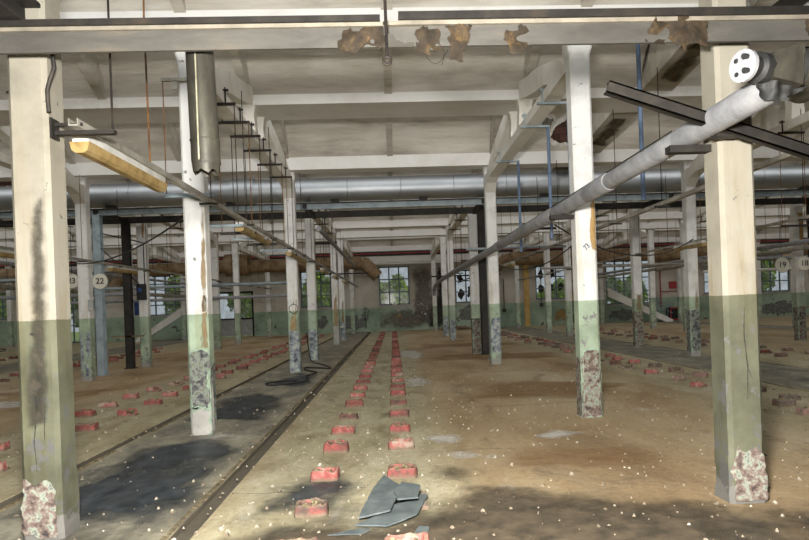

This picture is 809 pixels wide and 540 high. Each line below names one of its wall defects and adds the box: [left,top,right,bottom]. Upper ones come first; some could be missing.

spalling [540,114,568,147]
spalling [685,308,701,353]
spalling [188,349,216,435]
spalling [576,348,603,418]
spalling [730,447,769,502]
spalling [21,479,58,539]